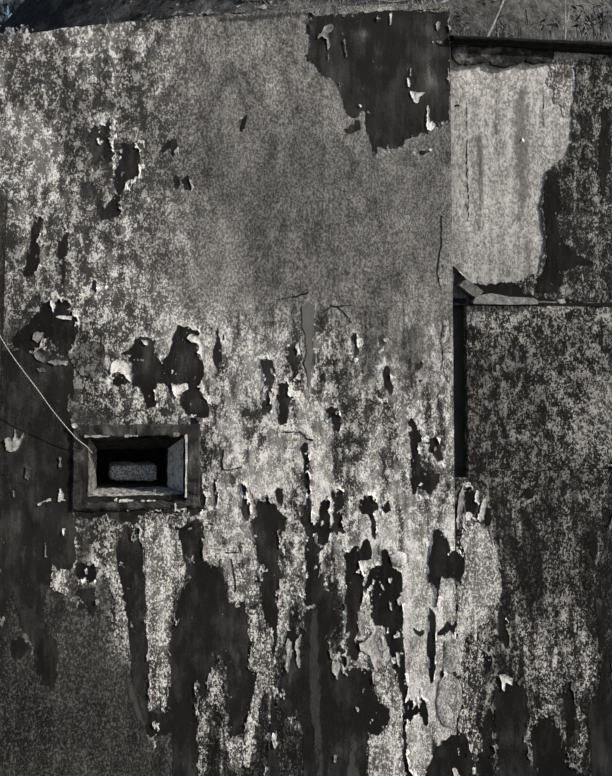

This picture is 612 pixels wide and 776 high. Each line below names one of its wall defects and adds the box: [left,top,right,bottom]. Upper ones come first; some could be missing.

peeling [304,8,460,159]
peeling [87,118,145,224]
peeling [595,106,612,203]
peeling [57,224,72,285]
peeling [91,280,109,295]
peeling [405,416,445,499]
peeling [0,294,257,776]
peeling [237,442,612,776]
water stain [309,610,323,776]
water stain [346,734,360,776]